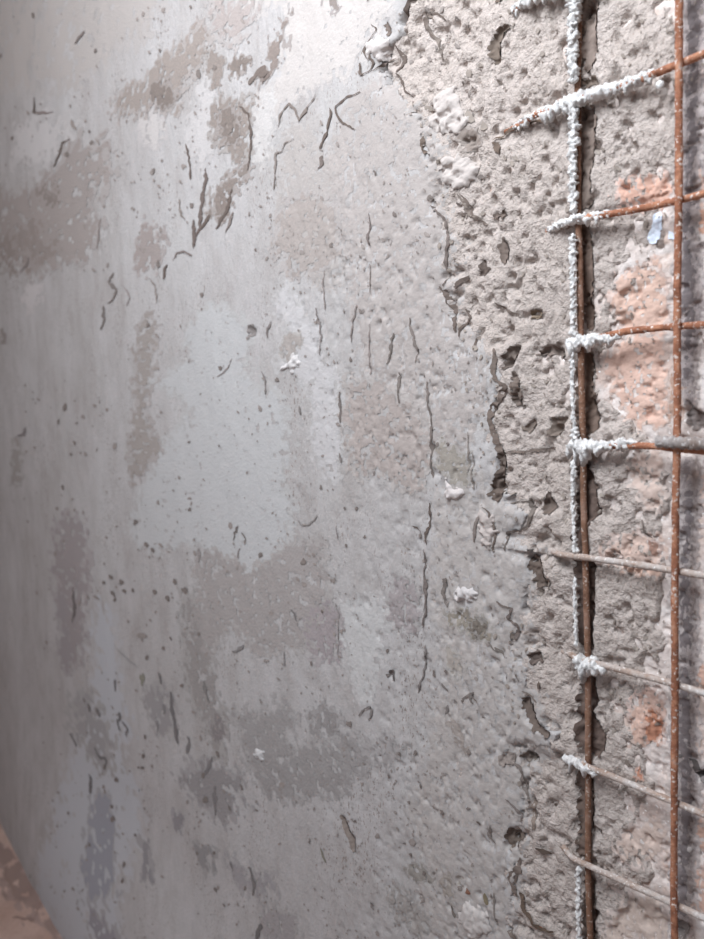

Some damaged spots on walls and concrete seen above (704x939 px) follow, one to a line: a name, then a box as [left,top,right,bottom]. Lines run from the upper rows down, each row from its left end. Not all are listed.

leakage [0,0,295,288]
crack [149,144,233,303]
crack [239,24,413,190]
crack [403,0,446,59]
spalling [478,260,491,276]
leakage [669,0,704,407]
leakage [335,371,478,498]
crack [430,194,553,551]
spalling [486,0,704,939]
corrosion [646,539,663,556]
leakage [140,530,411,832]
corrosion [639,705,665,747]